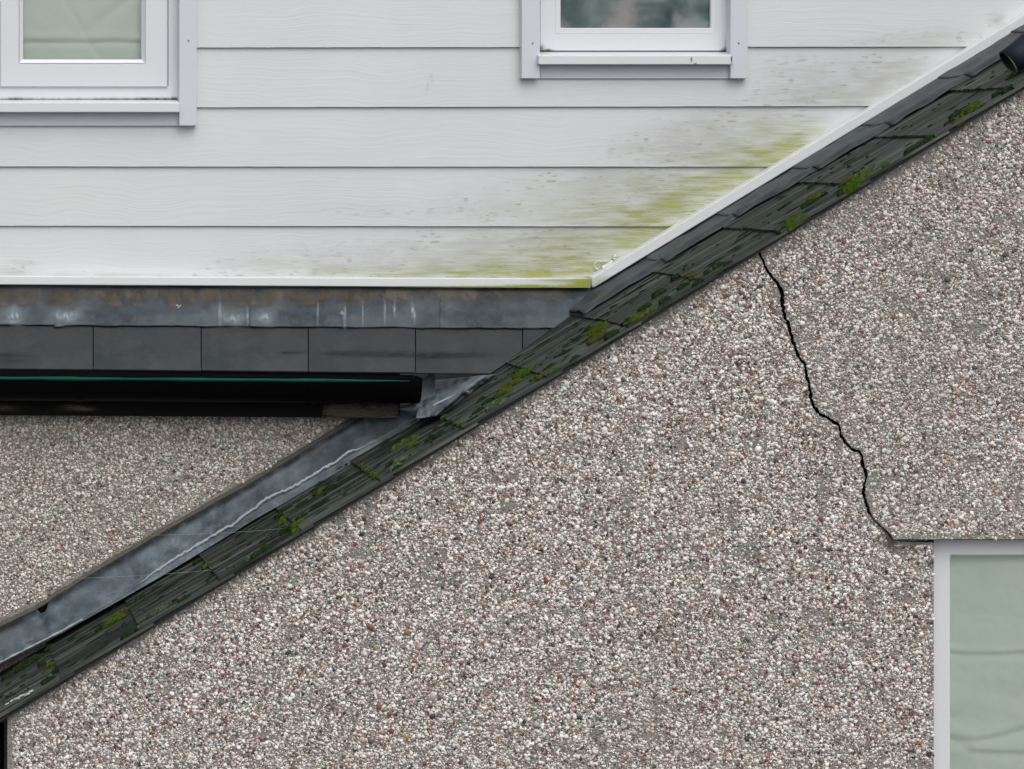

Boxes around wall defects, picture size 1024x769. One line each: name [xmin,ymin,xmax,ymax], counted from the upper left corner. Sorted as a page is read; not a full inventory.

crack [759,252,934,543]